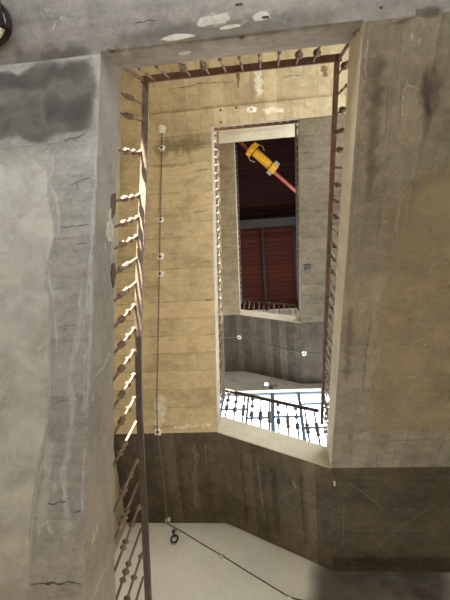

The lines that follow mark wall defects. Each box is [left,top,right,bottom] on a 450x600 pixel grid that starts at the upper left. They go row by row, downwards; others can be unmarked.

peeling [161,11,287,42]
damp [0,62,94,141]
peeling [247,106,284,115]
crack [27,579,81,587]